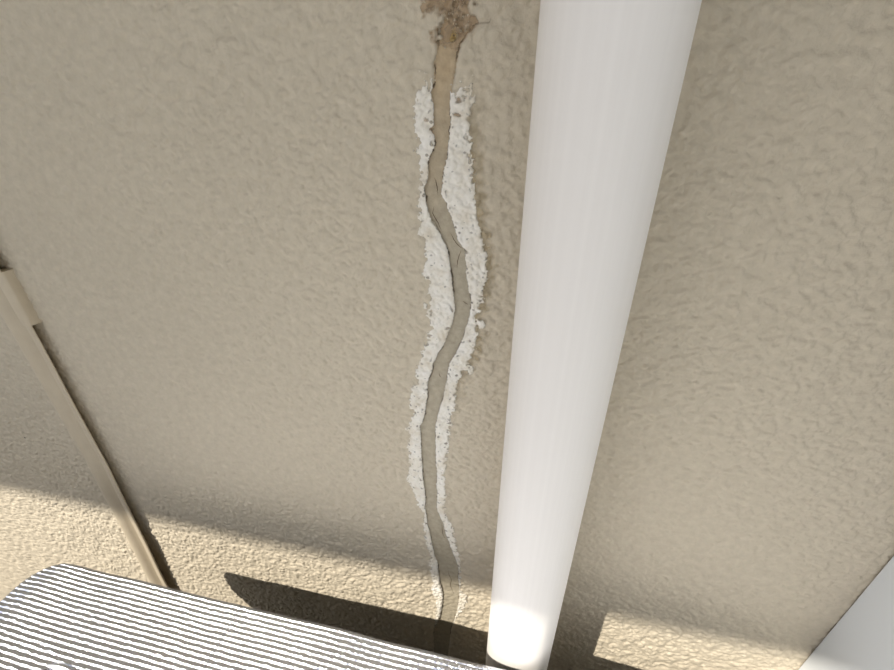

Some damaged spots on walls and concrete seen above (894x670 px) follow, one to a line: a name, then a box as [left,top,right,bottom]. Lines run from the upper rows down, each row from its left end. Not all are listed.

crack [405,16,488,656]